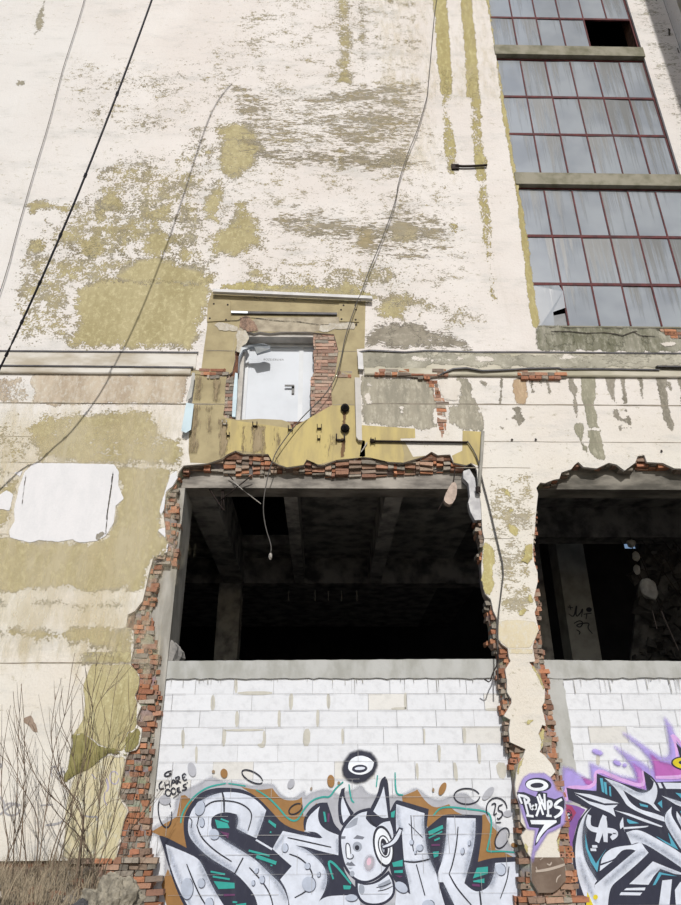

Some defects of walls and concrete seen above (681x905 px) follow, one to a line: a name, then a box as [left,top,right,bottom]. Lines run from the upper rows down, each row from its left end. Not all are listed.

peeling [34,1,45,35]
peeling [88,66,186,136]
leakage [433,0,456,174]
leakage [460,0,497,301]
peeling [486,0,540,328]
spalling [660,329,681,347]
leakage [361,320,681,460]
spalling [517,353,583,394]
peeling [500,407,525,429]
spalling [537,456,681,492]
spalling [168,640,185,661]
flaking render [24,716,37,732]